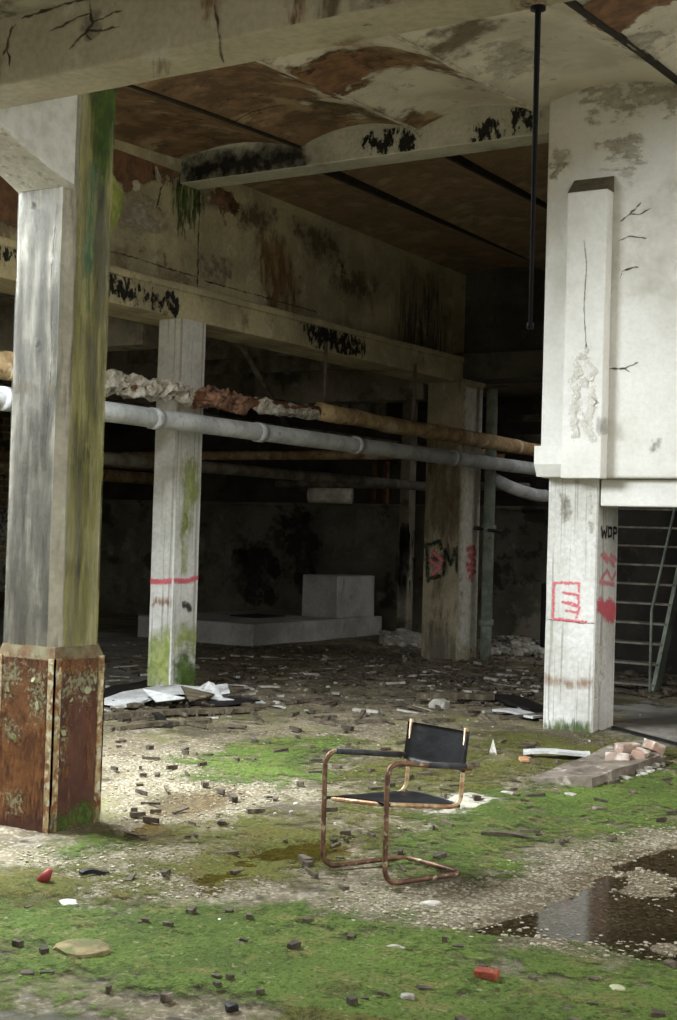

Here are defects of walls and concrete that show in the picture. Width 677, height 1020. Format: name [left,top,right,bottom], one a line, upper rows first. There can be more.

crack [3,0,122,66]
peeling [583,0,675,62]
peeling [282,49,392,119]
flaking render [0,176,20,229]
damp [74,139,104,647]
peeling [568,346,598,442]
rust [0,655,49,817]